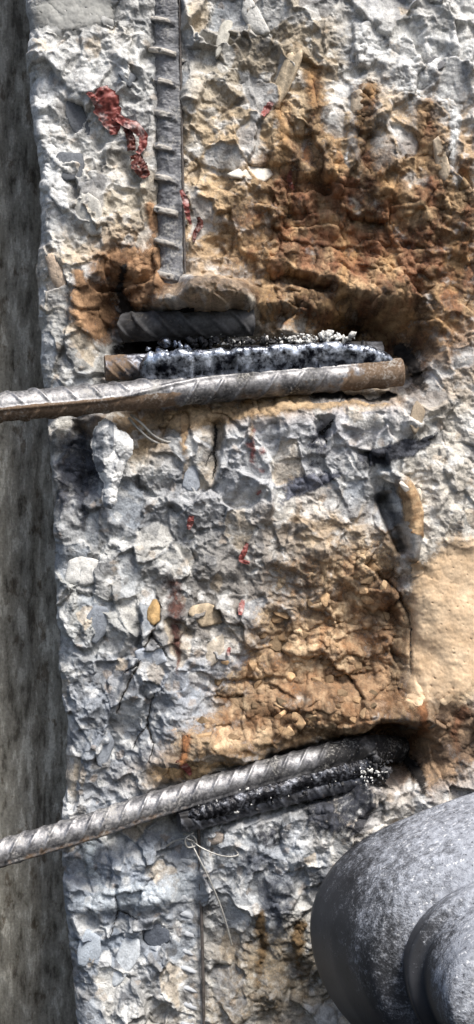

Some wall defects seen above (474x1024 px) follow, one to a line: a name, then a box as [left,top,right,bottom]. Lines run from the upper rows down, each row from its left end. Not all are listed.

peeling [35,0,117,36]
rust [219,60,474,368]
rust [69,202,170,343]
spalling [117,309,256,342]
peeling [91,418,133,509]
crack [116,624,166,713]
rust [163,579,184,671]
spalling [175,533,474,755]
crack [133,693,155,763]
rust [149,734,246,781]
rust [384,697,474,786]